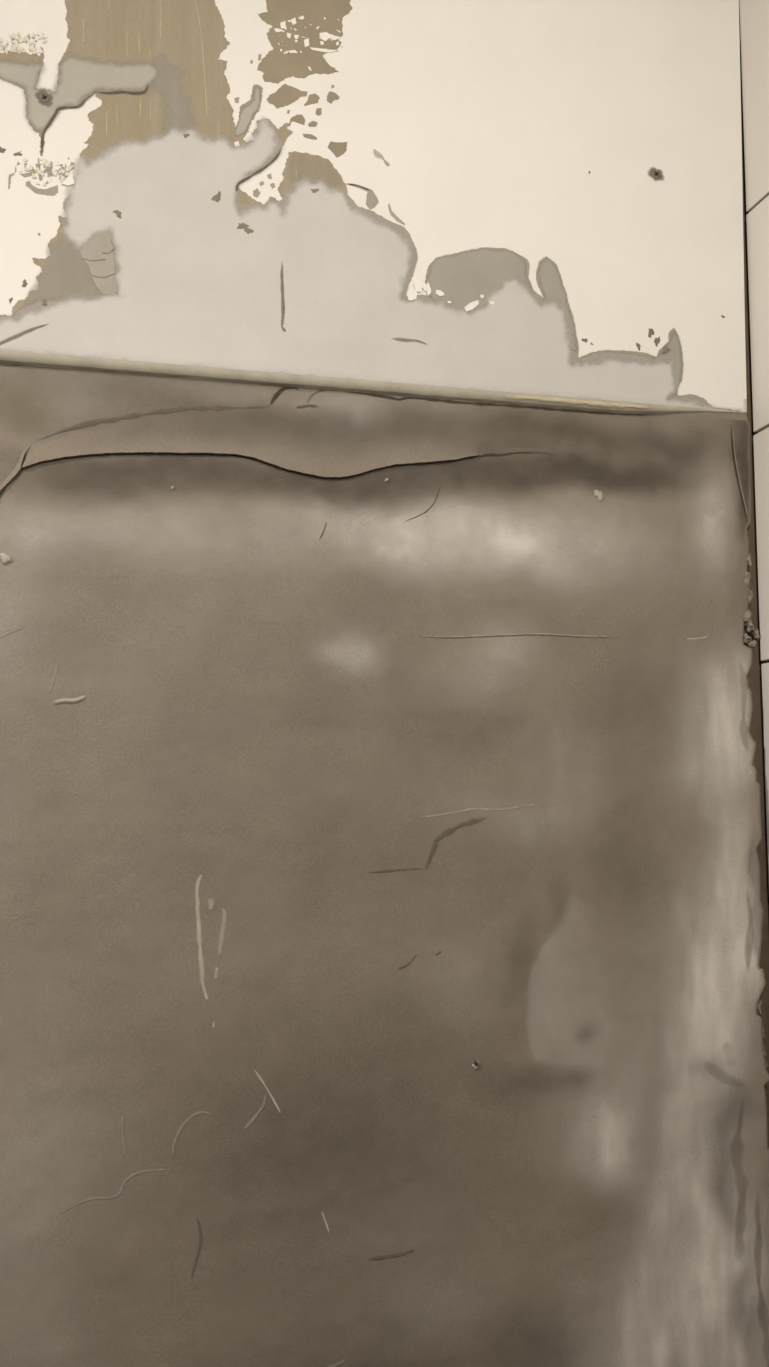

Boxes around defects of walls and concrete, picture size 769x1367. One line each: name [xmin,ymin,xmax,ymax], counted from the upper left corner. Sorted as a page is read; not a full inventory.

peeling [0,0,741,412]
crack [0,387,531,521]
water stain [67,455,667,500]
crack [350,392,648,415]
water stain [196,875,227,1000]